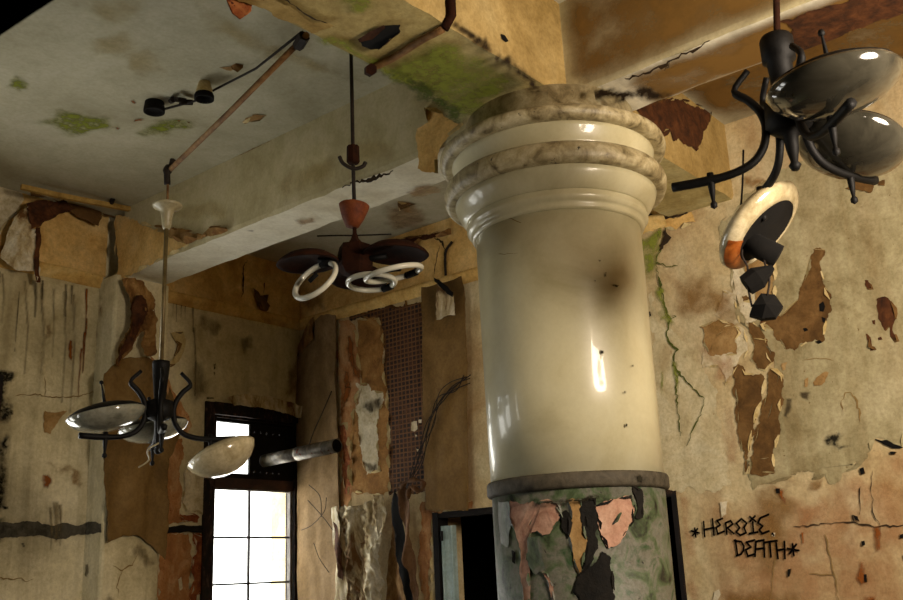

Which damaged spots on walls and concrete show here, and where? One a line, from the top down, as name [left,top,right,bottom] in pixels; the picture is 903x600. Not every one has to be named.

peeling [227,0,334,34]
flaking render [358,25,400,50]
peeling [780,0,903,50]
peeling [219,63,243,72]
water stain [322,37,510,122]
water stain [46,113,109,134]
water stain [139,120,189,135]
peeling [415,107,464,173]
water stain [683,282,728,312]
peeling [646,160,903,517]
flaking render [336,300,473,600]
peeling [498,486,644,600]